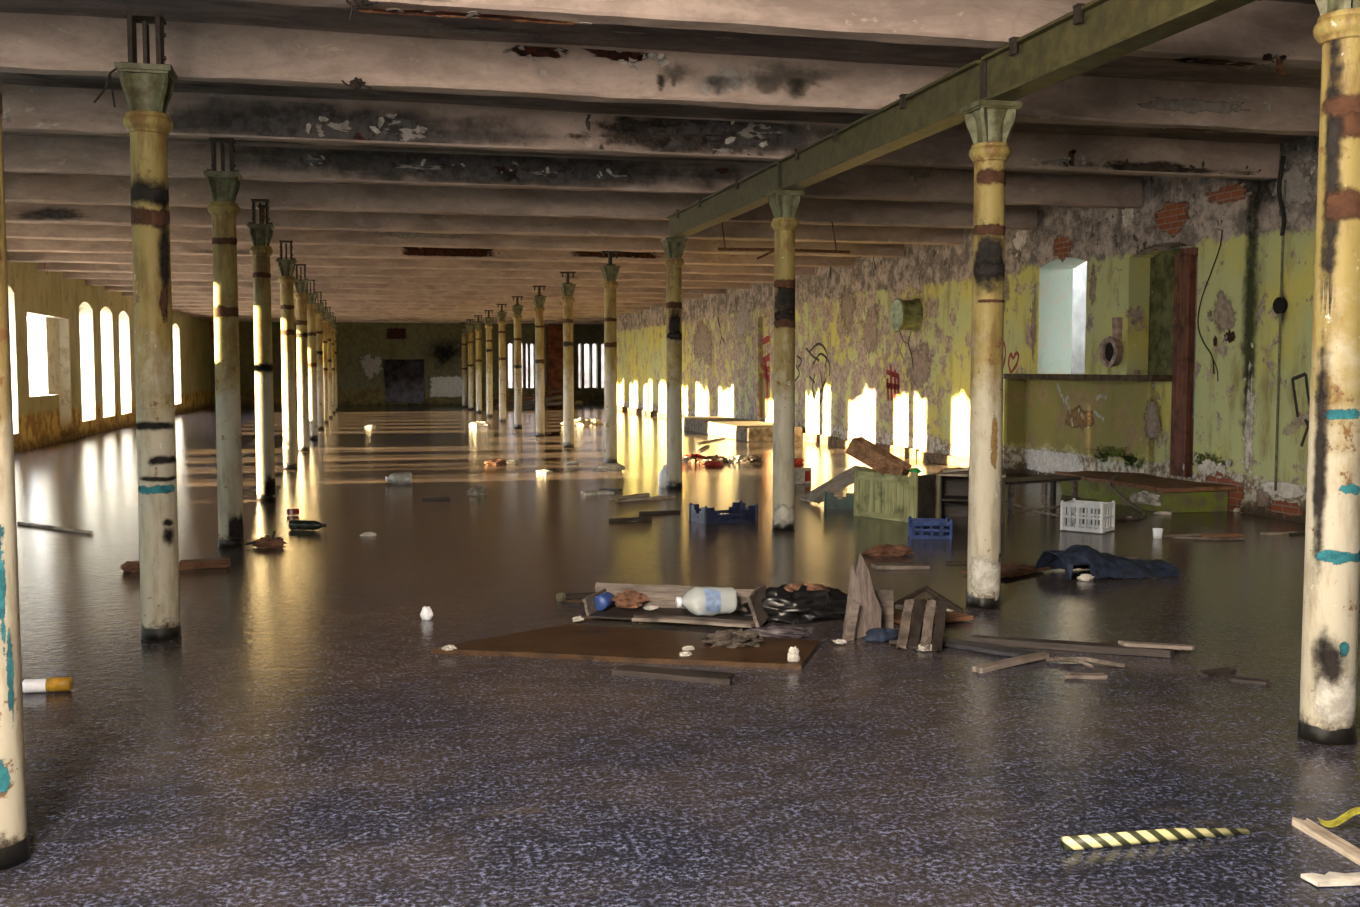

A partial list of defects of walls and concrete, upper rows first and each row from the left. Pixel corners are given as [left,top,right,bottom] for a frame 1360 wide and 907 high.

peeling [1103,159,1262,204]
peeling [1272,143,1316,210]
peeling [1121,208,1135,228]
flaking render [1151,199,1191,237]
flaking render [1051,234,1072,262]
water stain [1242,196,1258,408]
water stain [1312,347,1329,561]
peeling [0,525,14,716]
water stain [1313,637,1344,686]
peeling [1339,642,1349,657]
peeling [0,760,11,793]